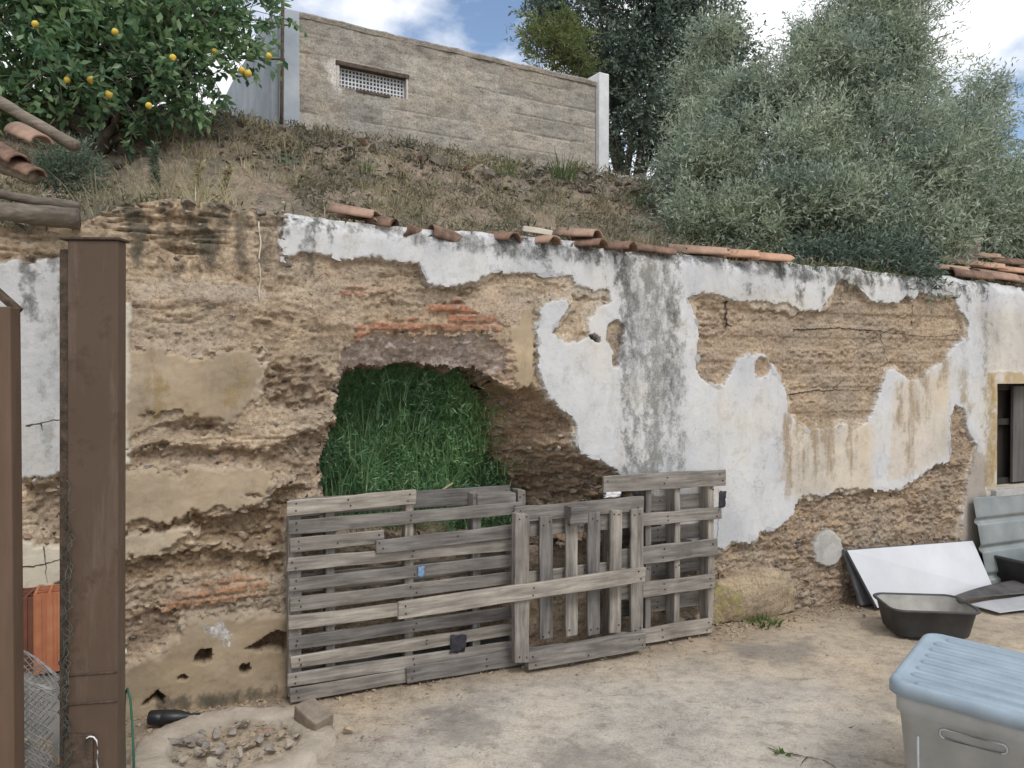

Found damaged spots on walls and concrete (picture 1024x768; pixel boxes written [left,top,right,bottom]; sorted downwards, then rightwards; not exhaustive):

damp [456,232,599,261]
damp [759,264,970,300]
damp [614,251,683,473]
spalling [686,278,970,433]
crack [794,306,958,366]
spalling [0,197,627,666]
spalling [713,405,980,611]
spalling [621,616,630,632]
spalling [651,610,666,627]
spalling [680,606,700,622]